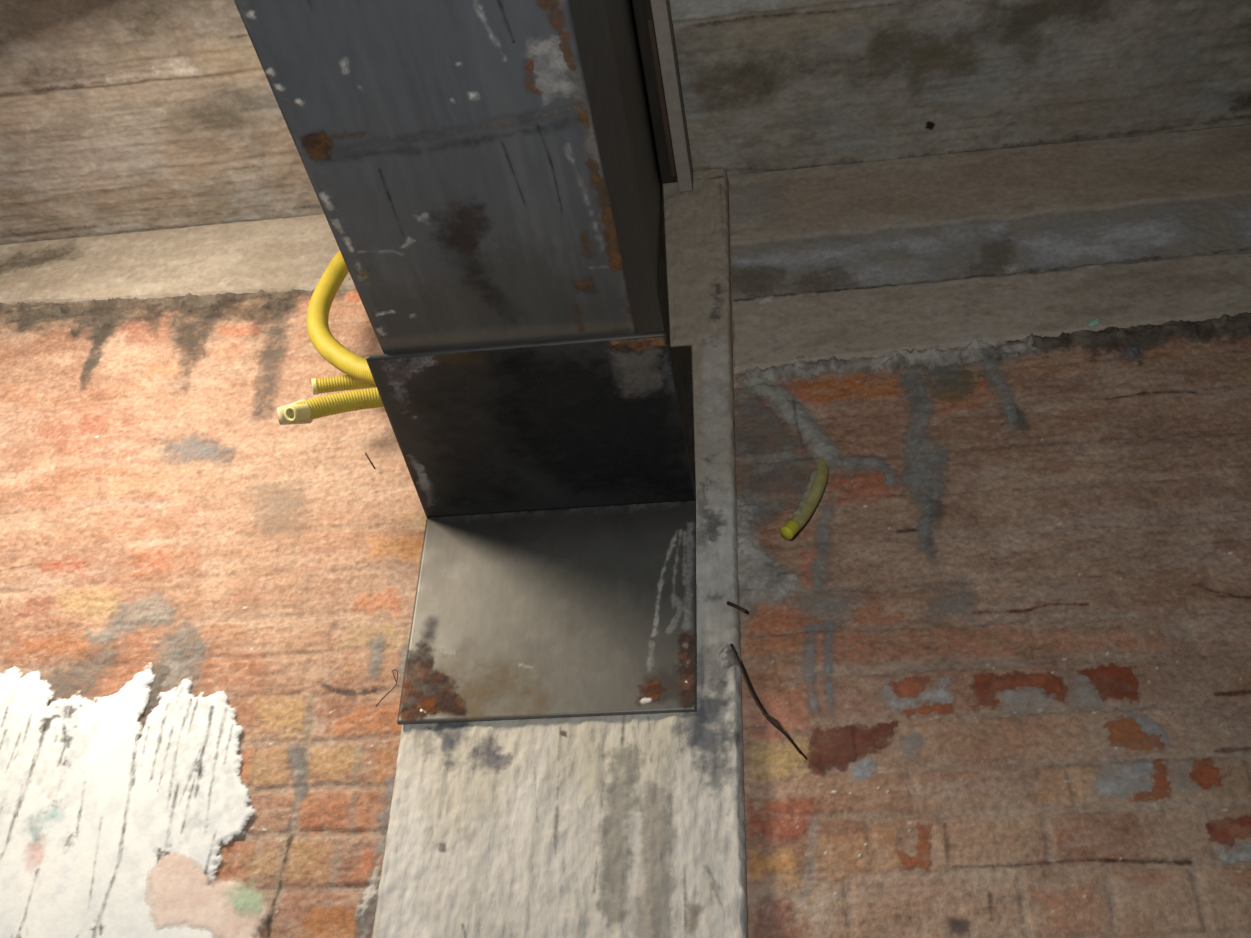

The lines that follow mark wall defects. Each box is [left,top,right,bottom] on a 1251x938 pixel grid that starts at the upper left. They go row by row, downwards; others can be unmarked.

rust [301,132,364,160]
rust [586,161,622,272]
water stain [81,323,113,388]
water stain [172,306,221,388]
water stain [254,300,291,416]
rust [400,643,466,721]
rust [639,680,665,700]
rust [678,633,696,707]
peeling [0,663,268,938]